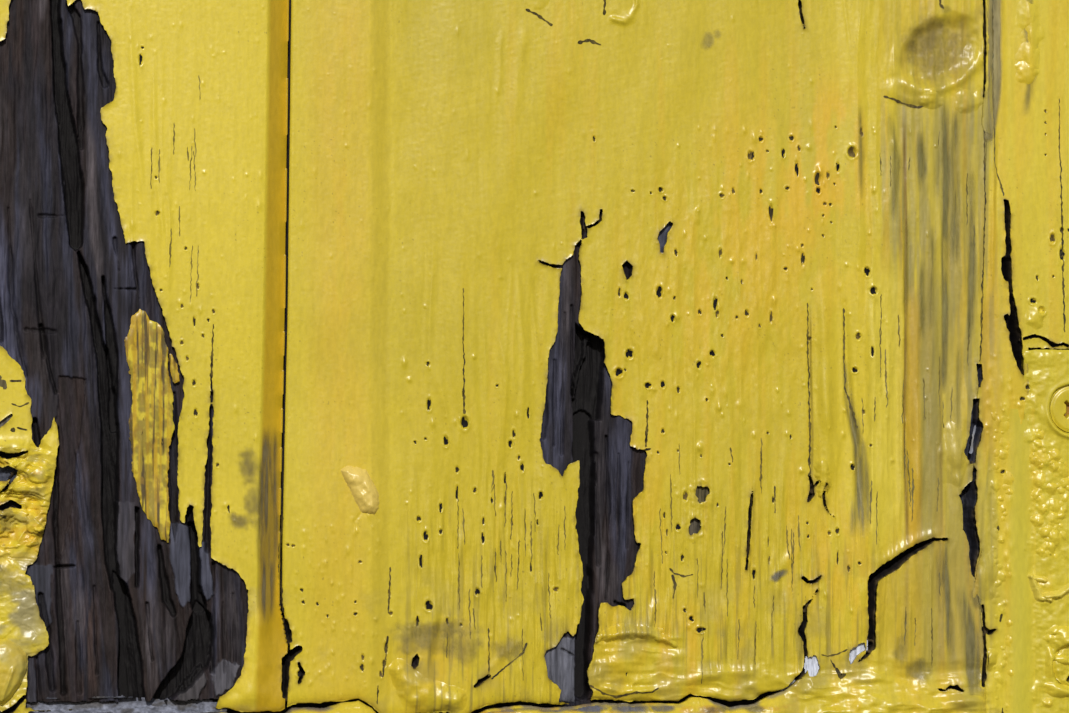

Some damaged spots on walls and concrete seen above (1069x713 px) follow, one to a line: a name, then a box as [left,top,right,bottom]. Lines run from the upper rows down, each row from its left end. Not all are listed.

crack [797,0,805,29]
crack [880,155,910,187]
crack [883,96,924,108]
crack [966,0,1069,374]
peeling [0,0,248,703]
crack [0,380,29,519]
peeling [540,211,659,707]
crack [644,400,652,451]
crack [653,294,953,684]
crack [938,596,1003,692]